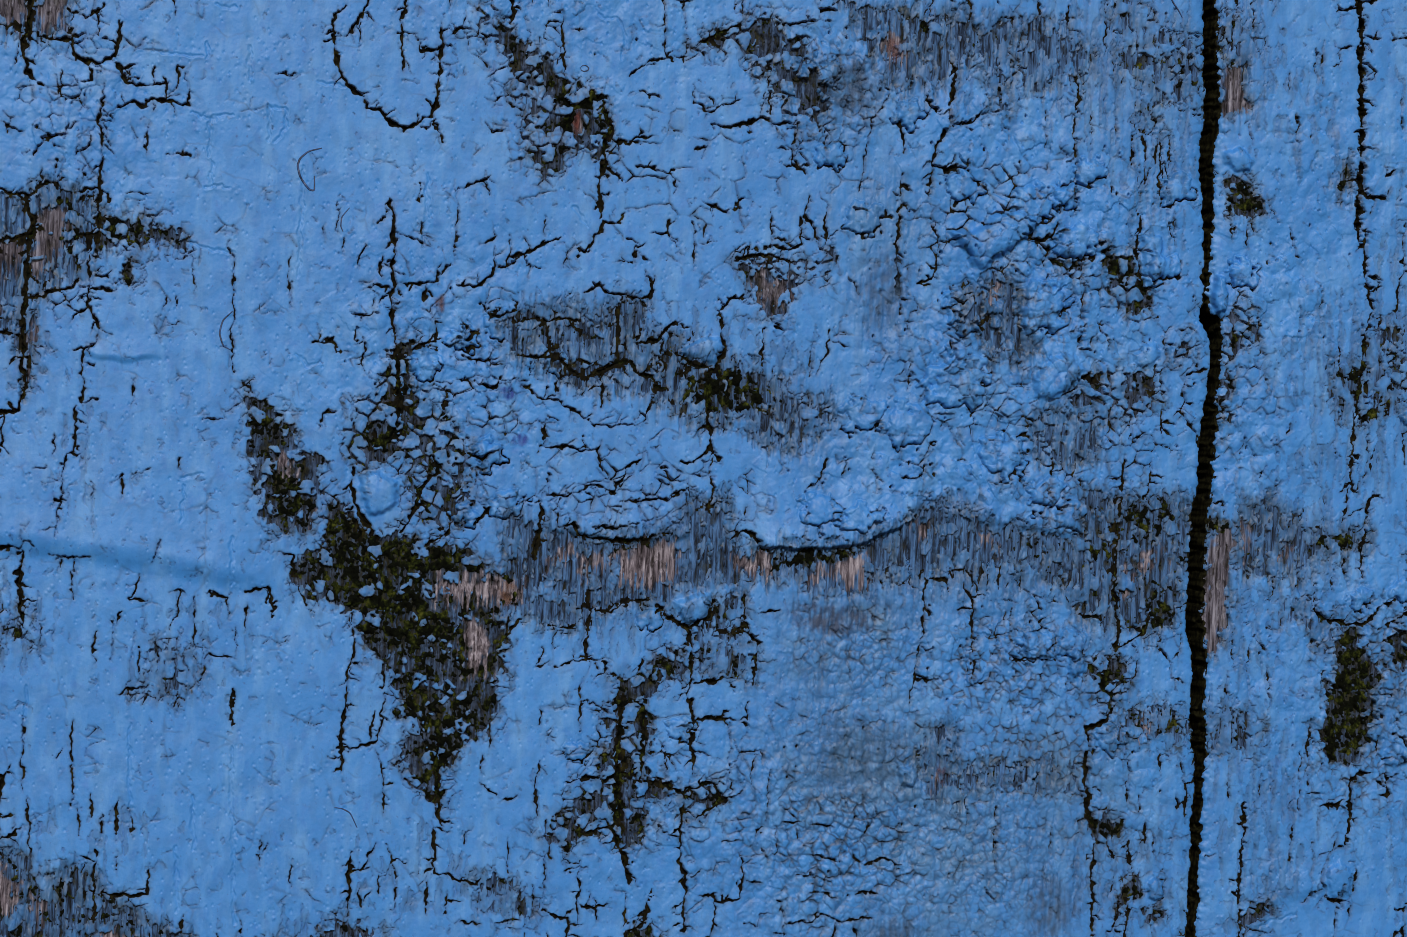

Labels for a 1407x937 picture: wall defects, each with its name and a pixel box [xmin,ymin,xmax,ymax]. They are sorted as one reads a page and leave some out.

peeling [475,7,615,182]
peeling [686,11,837,143]
peeling [837,0,1096,112]
peeling [1109,0,1257,133]
peeling [0,181,190,382]
crack [209,225,291,420]
peeling [503,300,836,451]
peeling [737,247,838,320]
crack [312,0,1407,937]
crack [91,553,312,726]
peeling [237,326,1407,855]
peeling [0,846,191,937]